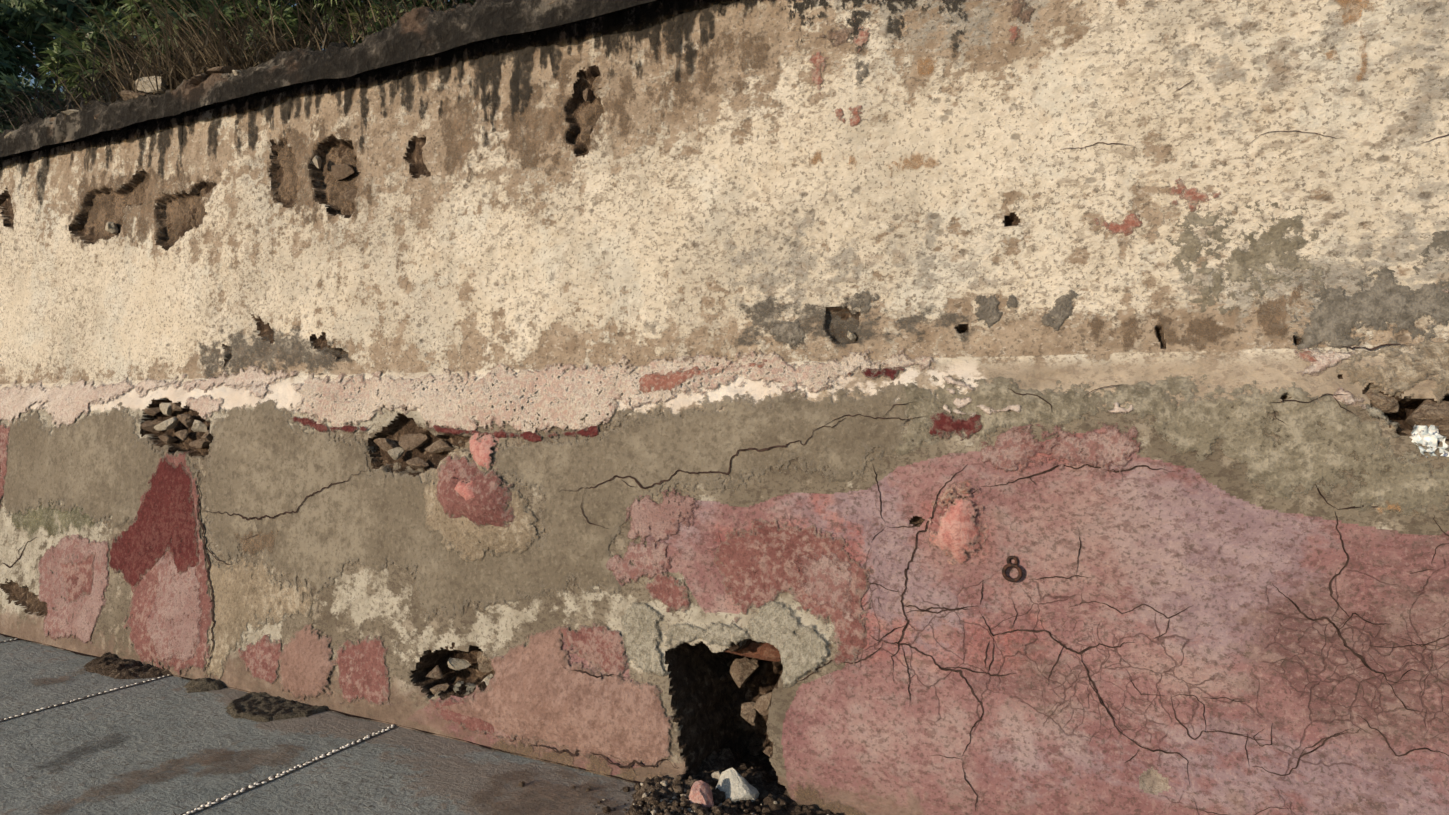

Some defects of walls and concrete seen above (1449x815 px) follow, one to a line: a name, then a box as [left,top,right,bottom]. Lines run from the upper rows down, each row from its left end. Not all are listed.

spalling [268,134,361,218]
leakage [0,0,967,249]
spalling [562,65,604,157]
leakage [198,325,352,379]
leakage [737,297,969,348]
flaking render [0,169,1449,784]
crack [560,402,923,529]
crack [797,464,1449,815]